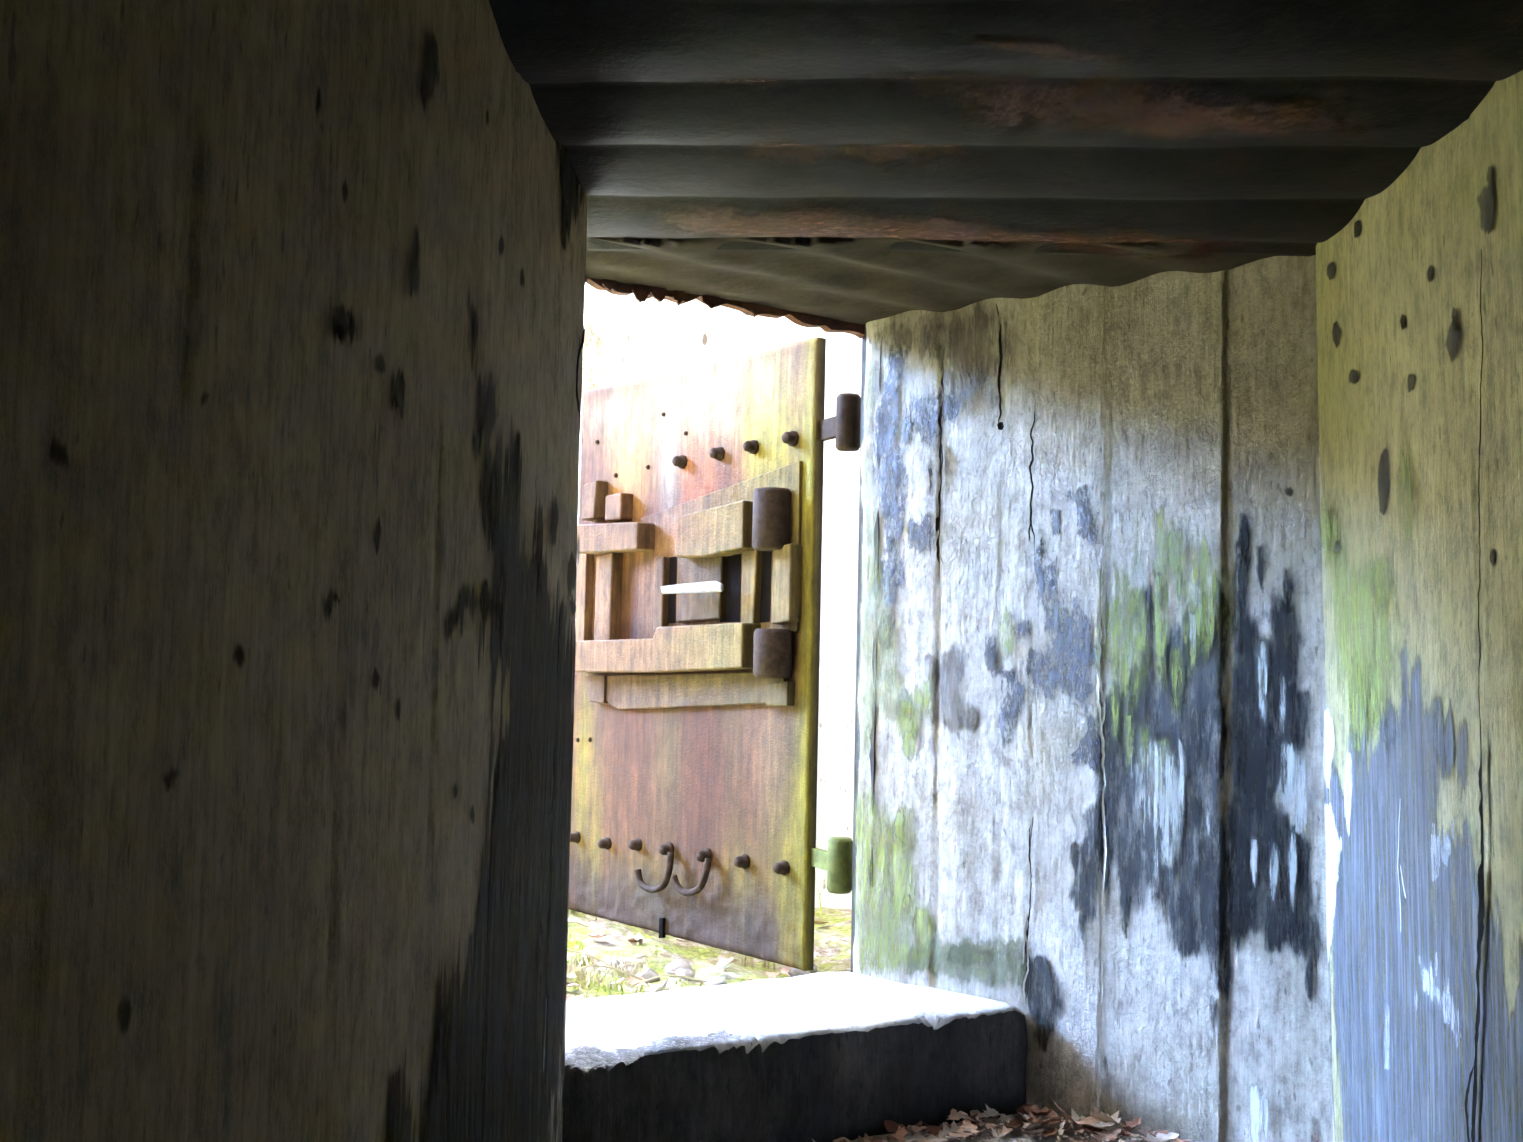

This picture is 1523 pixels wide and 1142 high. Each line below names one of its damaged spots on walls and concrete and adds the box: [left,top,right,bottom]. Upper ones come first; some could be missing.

damp [872,325,971,649]
crack [996,304,1036,555]
damp [1069,514,1523,1142]
damp [1025,956,1063,1053]